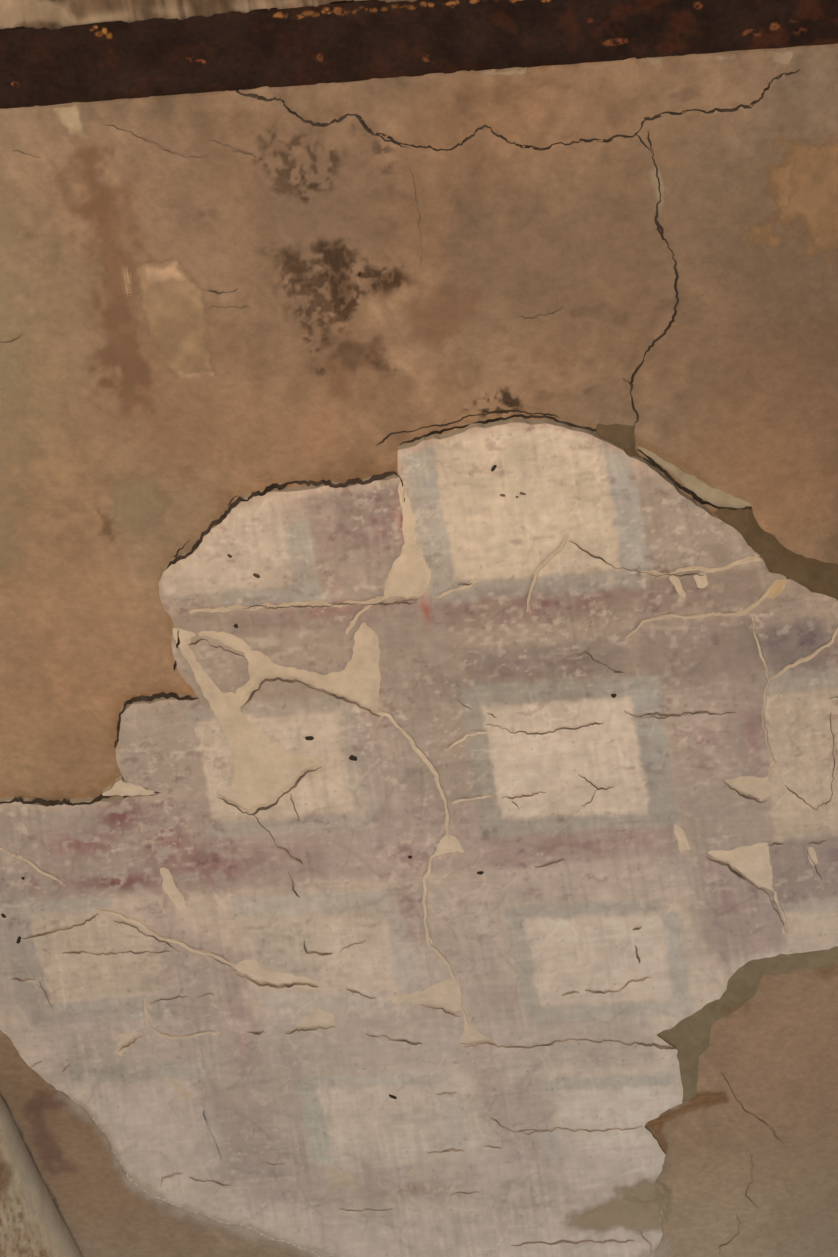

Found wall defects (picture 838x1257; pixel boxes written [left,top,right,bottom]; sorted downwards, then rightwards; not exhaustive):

corrosion [274,0,478,19]
corrosion [743,20,807,37]
crack [236,70,799,510]
flaking render [384,483,430,598]
flaking render [172,623,381,810]
flaking render [102,775,156,796]
flaking render [725,776,770,801]
flaking render [161,869,188,911]
flaking render [708,843,774,891]
flaking render [231,959,320,987]
crack [719,1074,782,1254]
flaking render [570,1180,669,1232]